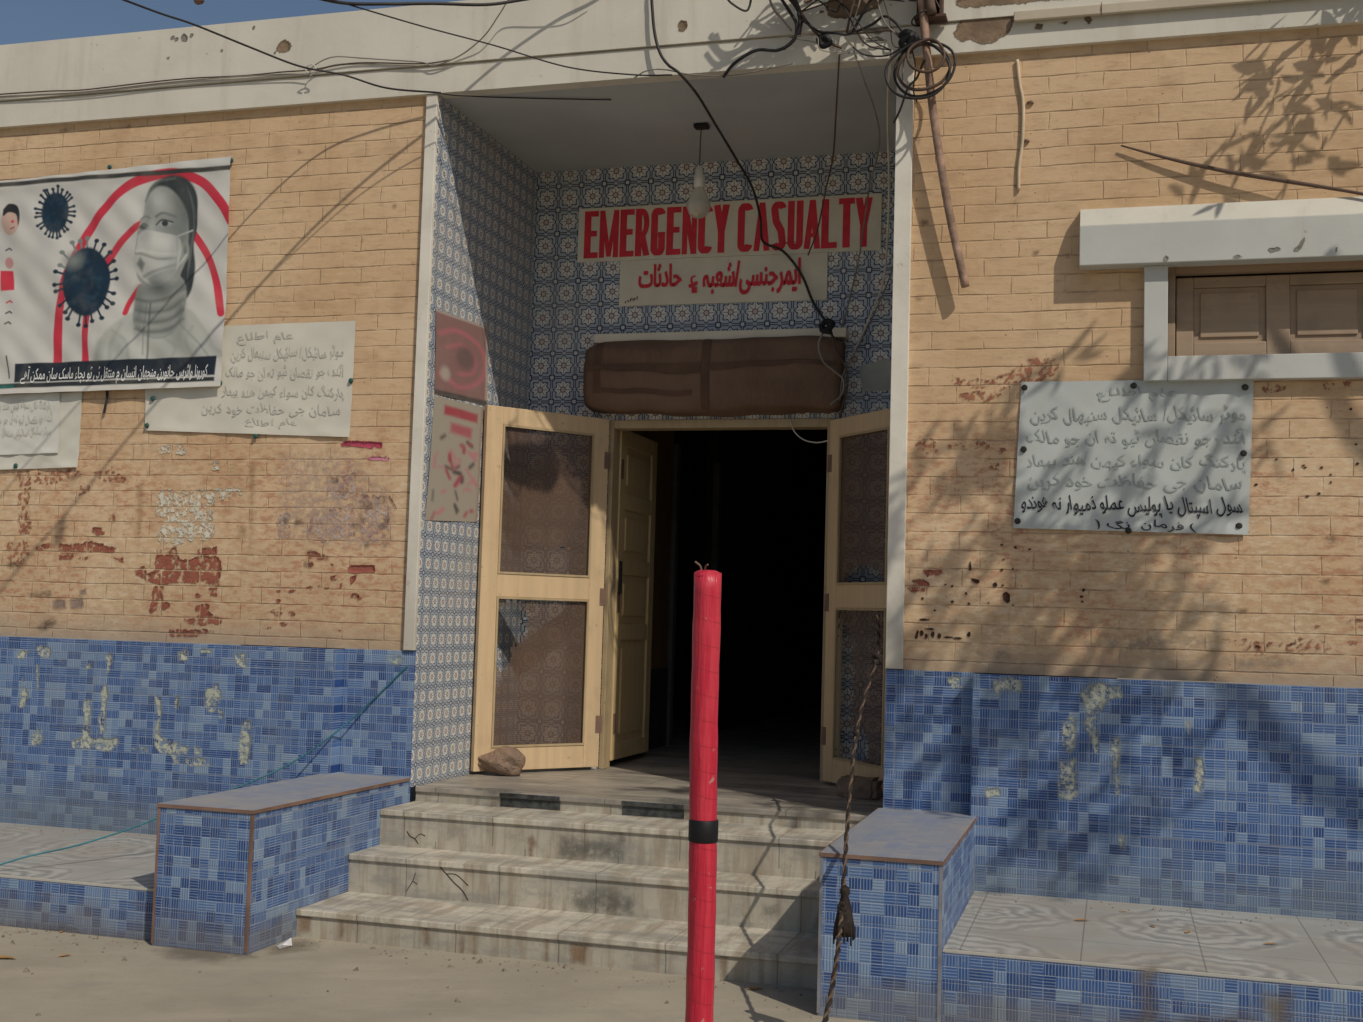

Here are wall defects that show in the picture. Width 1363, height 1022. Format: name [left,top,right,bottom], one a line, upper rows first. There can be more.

spalling [953,0,1049,44]
peeling [952,357,1059,402]
peeling [7,469,242,660]
peeling [17,645,51,688]
peeling [99,653,112,734]
peeling [239,720,251,764]
peeling [1058,715,1079,800]